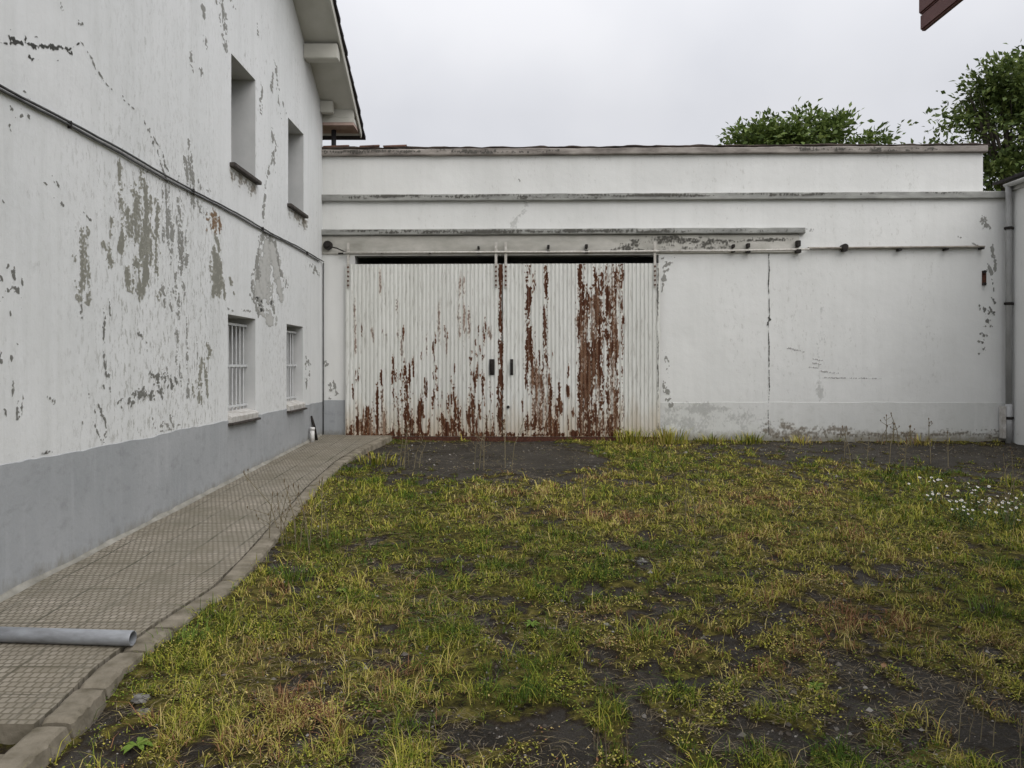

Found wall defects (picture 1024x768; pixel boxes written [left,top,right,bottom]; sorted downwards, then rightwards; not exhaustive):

peeling [72,139,289,408]
rust [346,264,626,437]
crack [767,254,877,435]